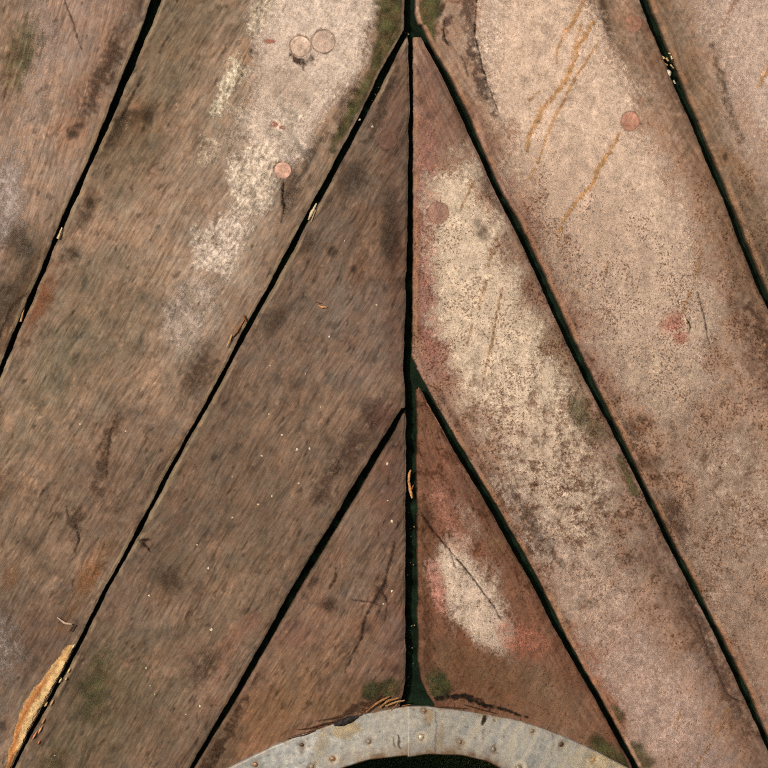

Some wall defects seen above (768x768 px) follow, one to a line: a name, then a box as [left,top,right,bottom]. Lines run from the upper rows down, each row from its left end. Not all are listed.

corrosion [526,0,597,152]
corrosion [559,133,620,232]
crack [346,550,394,667]
crack [422,515,500,618]
peeling [17,661,65,750]